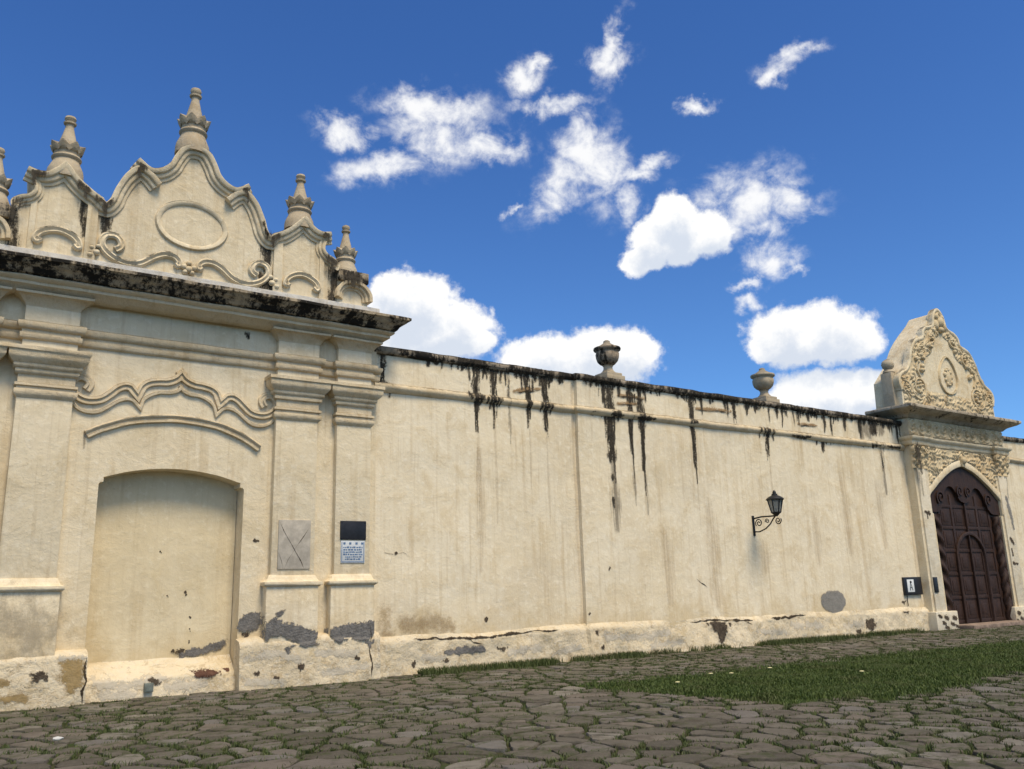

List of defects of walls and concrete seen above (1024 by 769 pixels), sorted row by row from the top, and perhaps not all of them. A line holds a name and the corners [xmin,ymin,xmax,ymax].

water stain [258,221,284,290]
water stain [323,232,363,301]
water stain [426,353,565,432]
water stain [583,374,663,496]
water stain [676,390,902,484]
crack [79,658,87,703]
peeling [0,654,229,704]
flaking render [171,616,228,658]
crack [414,629,560,644]
peeling [412,641,584,668]
flaking render [706,622,731,646]